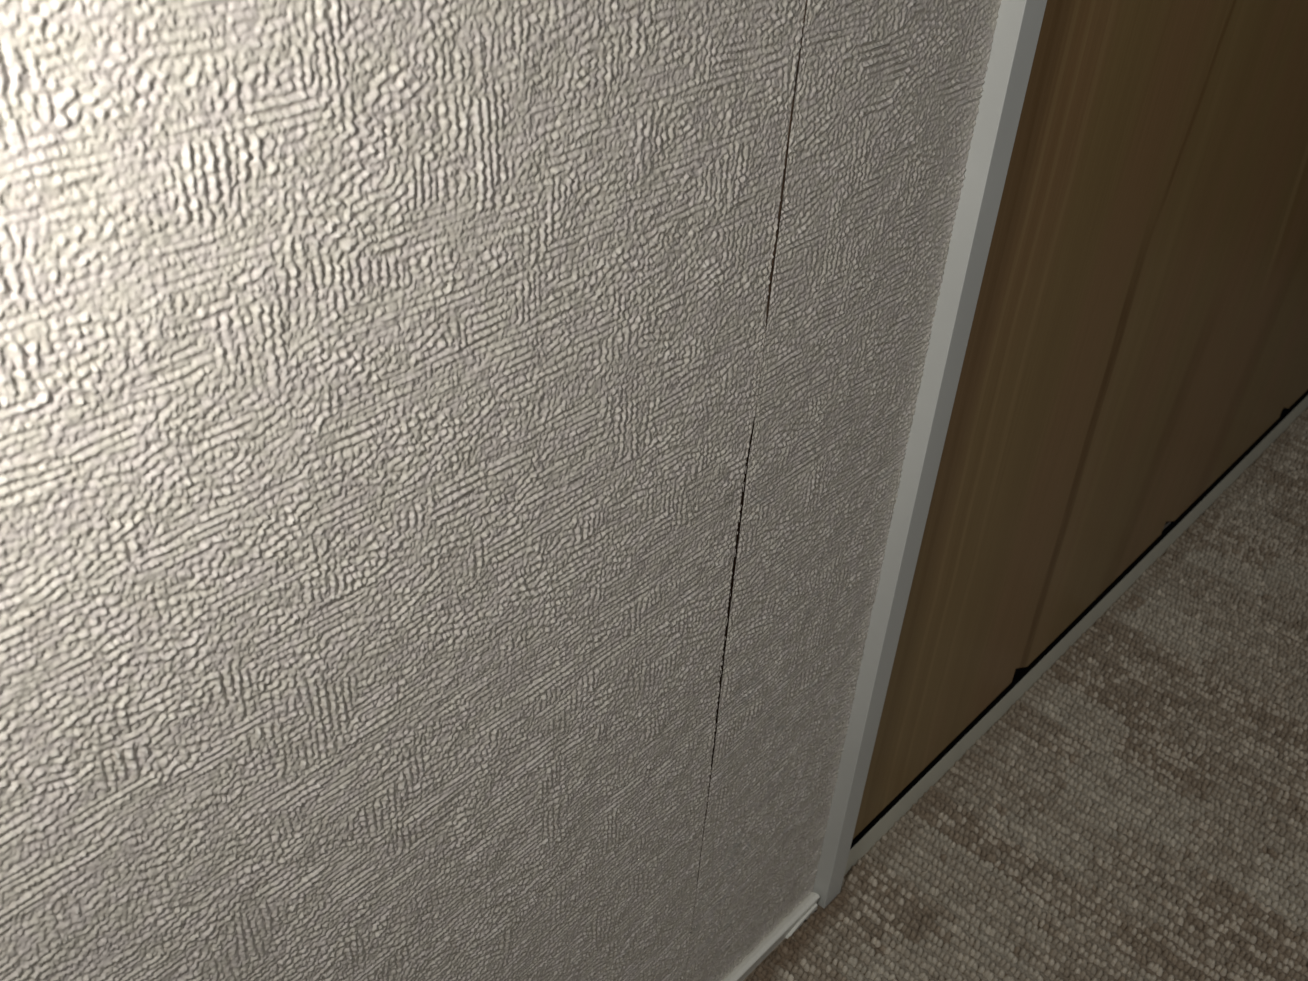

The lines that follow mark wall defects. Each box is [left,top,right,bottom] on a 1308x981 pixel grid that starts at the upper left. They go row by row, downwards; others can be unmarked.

crack [691,0,807,930]